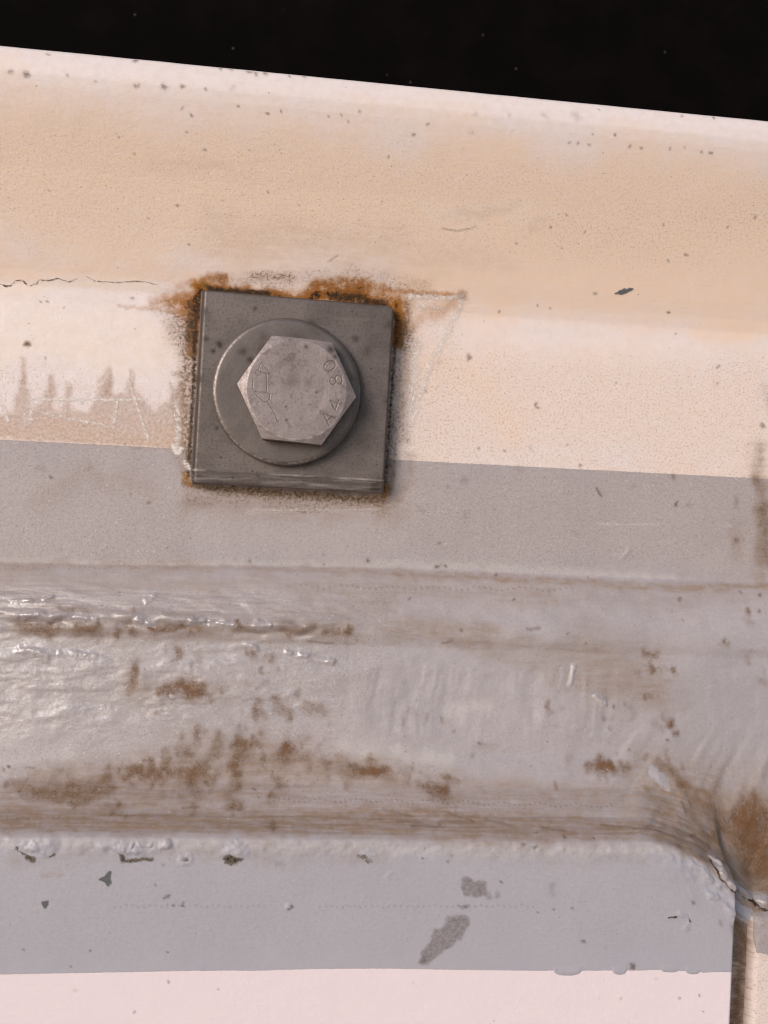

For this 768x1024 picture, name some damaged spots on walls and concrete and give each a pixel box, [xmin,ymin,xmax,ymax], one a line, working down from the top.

rust [165,266,428,511]
rust [157,679,205,700]
rust [123,751,215,795]
rust [228,739,254,810]
rust [277,742,293,765]
rust [350,758,389,777]
rust [419,775,450,800]
rust [713,792,768,882]
crack [709,858,768,912]